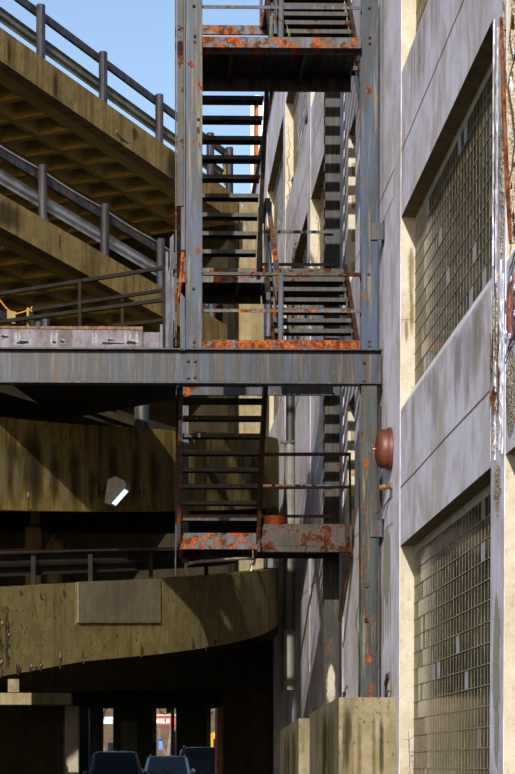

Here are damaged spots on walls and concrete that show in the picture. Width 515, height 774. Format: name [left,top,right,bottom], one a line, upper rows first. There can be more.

rust [176,250,185,305]
water stain [0,435,165,502]
water stain [284,737,295,774]
water stain [322,721,333,774]
water stain [344,715,352,774]